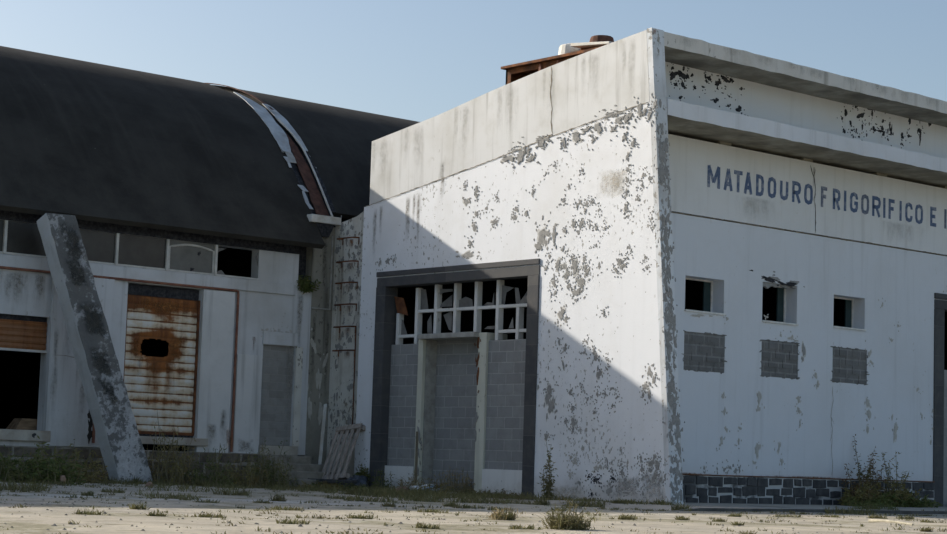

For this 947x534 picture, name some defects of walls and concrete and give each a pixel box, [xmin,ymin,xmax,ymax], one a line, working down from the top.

corrosion [206,83,273,110]
peeling [841,103,931,148]
corrosion [286,133,329,216]
water stain [61,224,85,285]
peeling [455,63,748,505]
peeling [308,215,362,447]
water stain [93,352,117,403]
peeling [700,392,785,475]